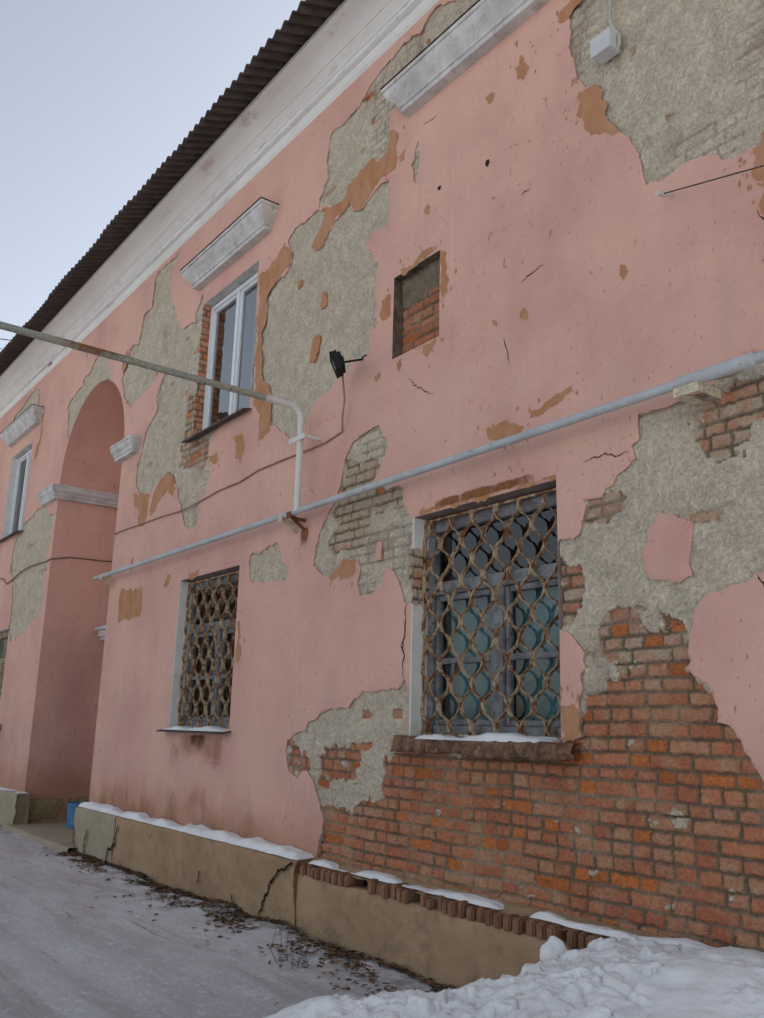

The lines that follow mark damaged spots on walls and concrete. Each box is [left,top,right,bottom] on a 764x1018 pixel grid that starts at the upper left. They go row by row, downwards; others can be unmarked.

peeling [510,40,536,81]
flaking render [553,0,764,215]
flaking render [234,0,477,469]
flaking render [67,253,223,535]
flaking render [9,507,56,642]
flaking render [249,543,288,583]
flaking render [285,352,764,952]
crack [73,826,118,861]
crack [258,862,292,915]